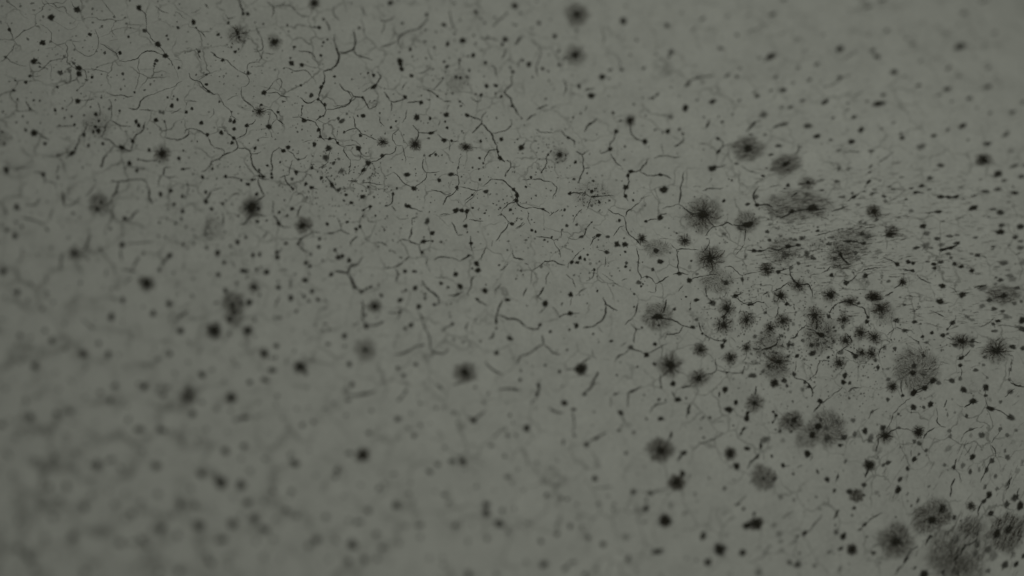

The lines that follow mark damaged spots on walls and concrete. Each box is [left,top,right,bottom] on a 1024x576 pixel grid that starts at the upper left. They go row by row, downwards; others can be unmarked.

water stain [980,142,1024,194]
crack [5,0,930,502]
water stain [633,248,676,330]
water stain [685,150,1024,493]
water stain [629,342,711,438]
water stain [631,490,671,527]
water stain [668,471,685,490]
water stain [687,532,746,566]
water stain [736,503,763,530]
water stain [817,470,868,553]
crack [865,381,1024,562]
water stain [969,492,1024,568]